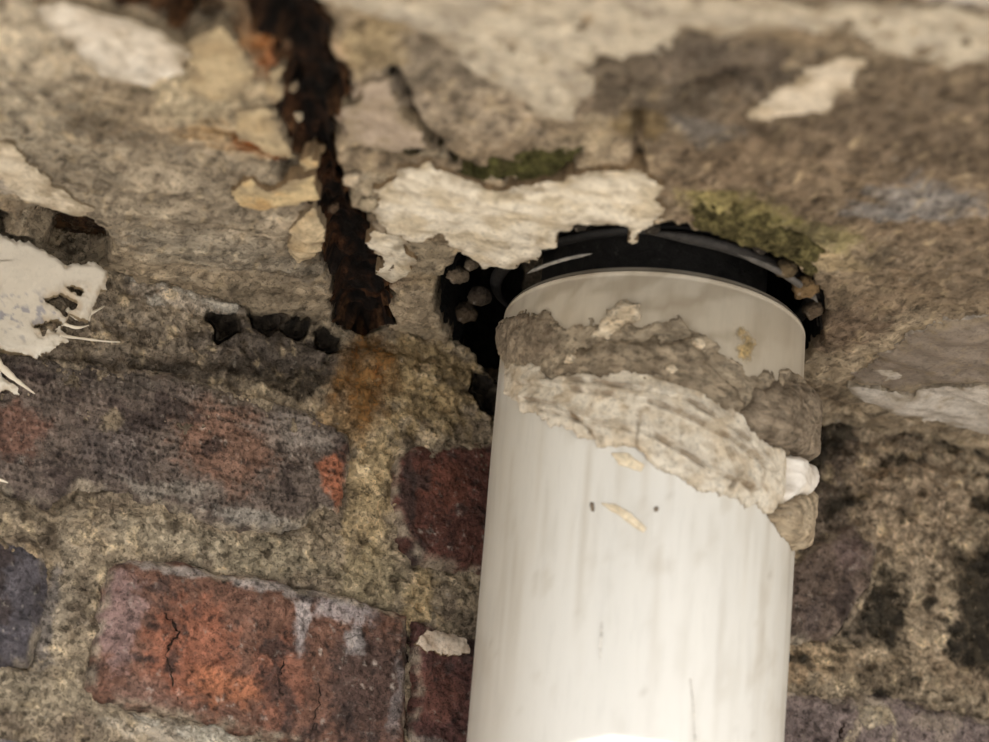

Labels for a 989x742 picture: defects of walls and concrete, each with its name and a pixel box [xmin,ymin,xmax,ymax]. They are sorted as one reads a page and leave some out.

peeling [0,139,106,236]
peeling [34,0,191,86]
crack [114,0,196,30]
peeling [231,58,327,263]
crack [246,0,397,336]
crack [389,65,421,117]
crack [403,136,464,162]
peeling [365,152,666,283]
peeling [322,0,989,122]
peeling [0,234,120,396]